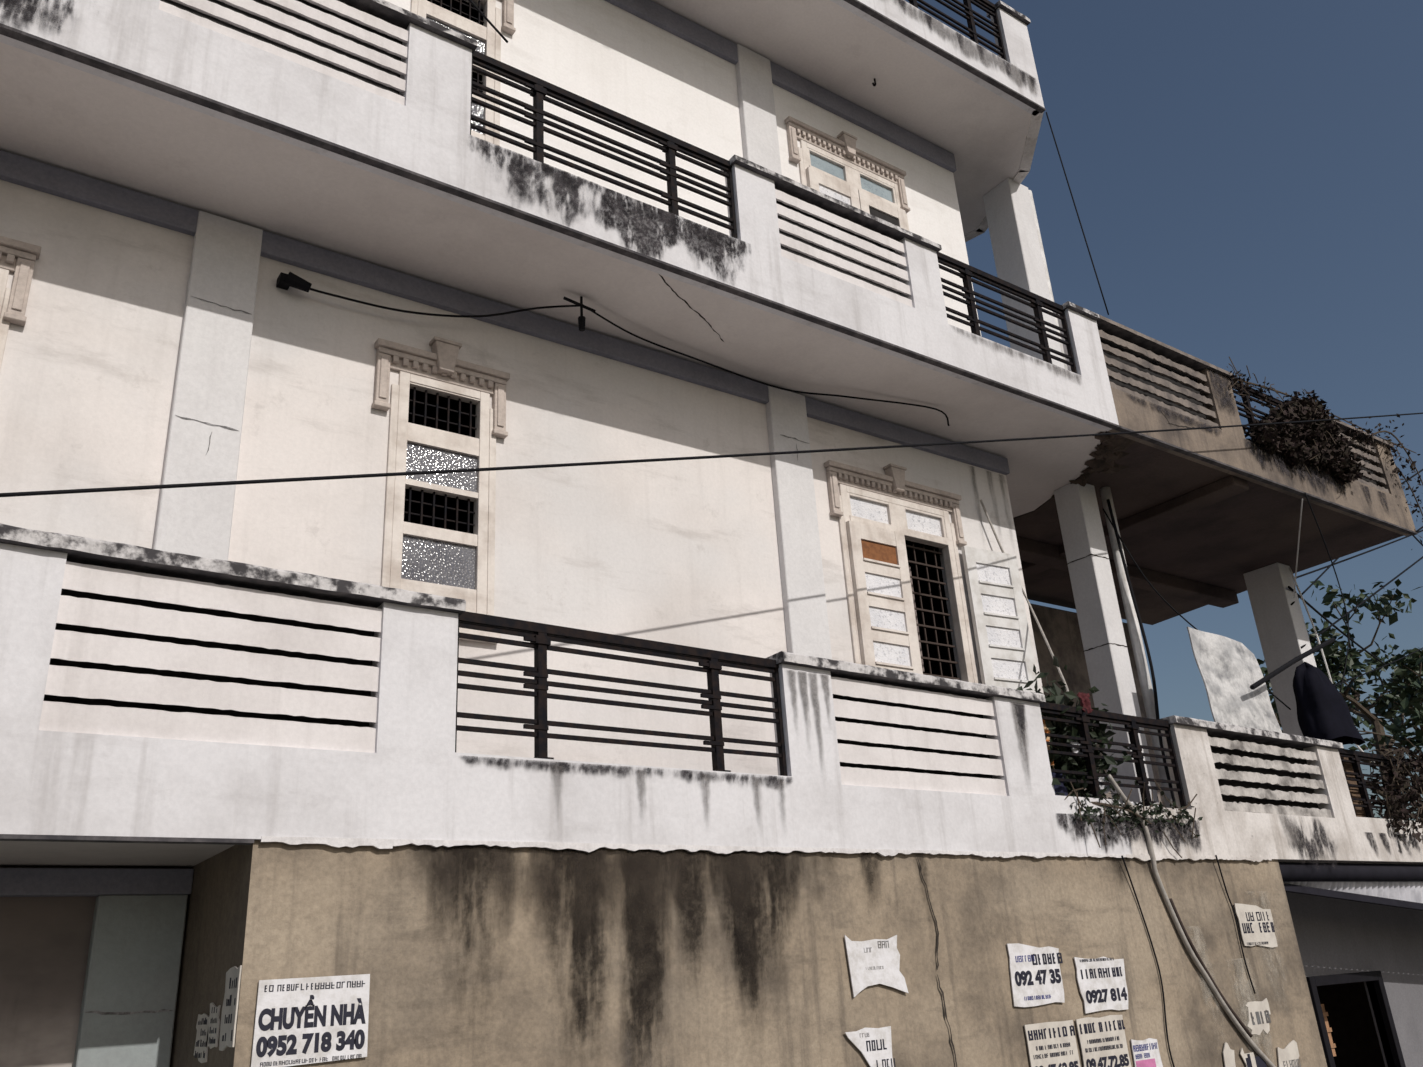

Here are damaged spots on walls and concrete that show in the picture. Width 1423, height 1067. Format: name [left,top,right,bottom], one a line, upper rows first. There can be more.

damp [0,0,73,30]
damp [472,137,747,280]
damp [463,756,663,794]
damp [681,770,792,802]
damp [432,845,515,917]
damp [861,853,878,890]
damp [1057,813,1200,876]
damp [534,847,799,1065]
crack [917,857,957,1067]